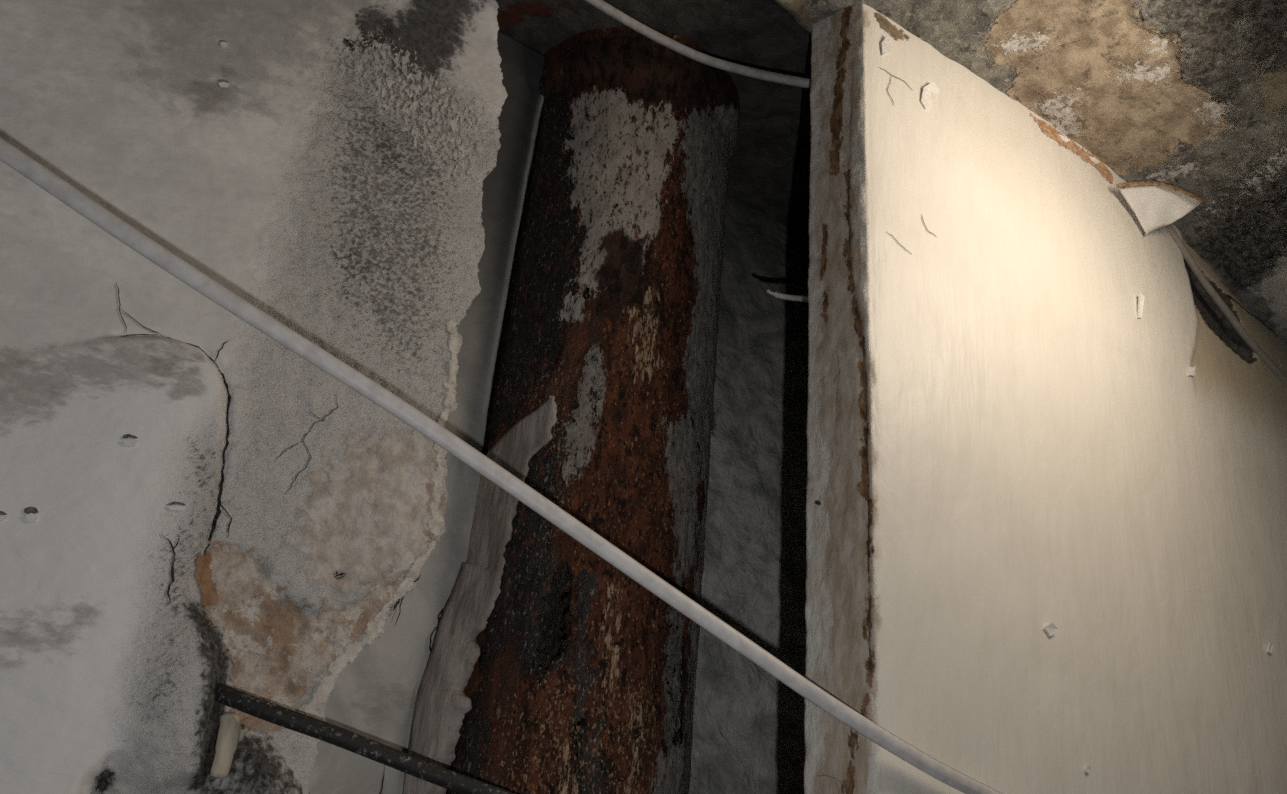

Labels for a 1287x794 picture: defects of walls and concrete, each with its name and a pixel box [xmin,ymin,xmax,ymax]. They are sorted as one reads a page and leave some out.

crack [116,284,232,602]
crack [274,398,338,495]
flaking render [194,428,448,717]
leakage [292,0,490,407]
flaking render [438,319,461,427]
rust [500,529,692,794]
rust [563,30,740,601]
rust [815,711,868,794]
rust [815,4,882,722]
flaking render [985,0,1233,235]
leakage [1149,0,1287,115]
leakage [1187,147,1287,289]